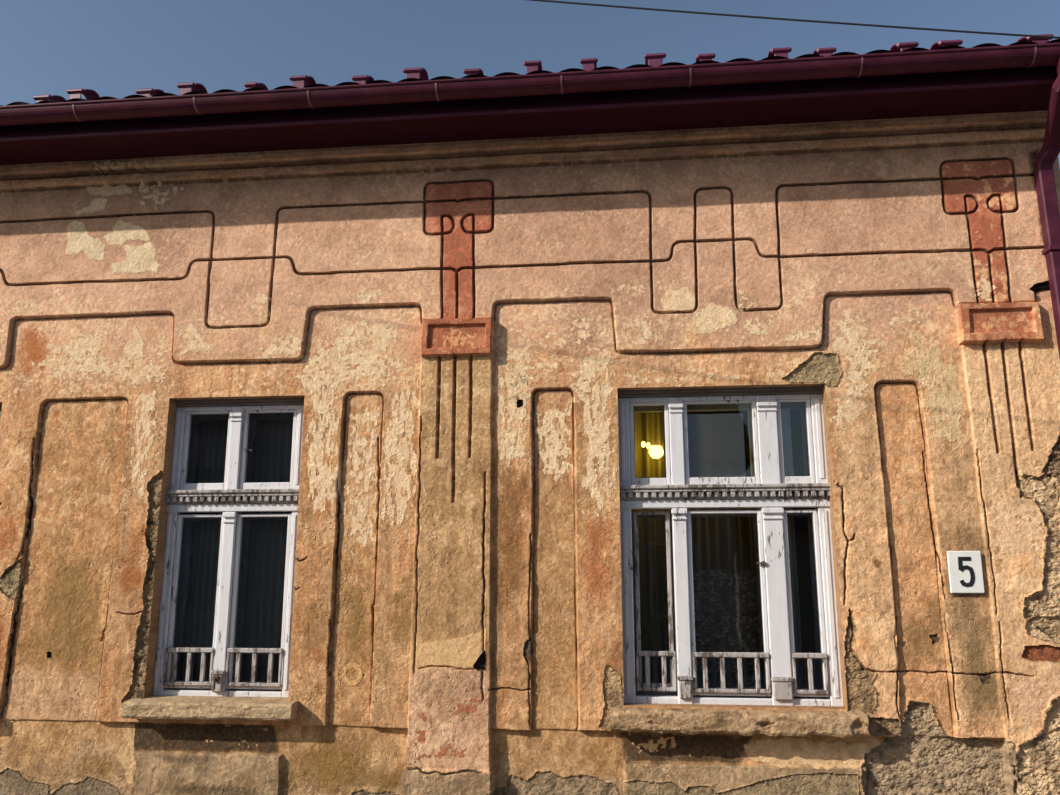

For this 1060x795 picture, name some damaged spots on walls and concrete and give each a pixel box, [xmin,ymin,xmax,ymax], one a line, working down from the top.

peeling [66,159,184,273]
spalling [0,559,23,599]
crack [6,600,19,702]
crack [17,439,35,561]
peeling [31,322,215,703]
peeling [255,287,425,556]
peeling [491,309,887,517]
spalling [486,435,1060,795]
crack [837,484,855,611]
crack [867,451,1033,719]